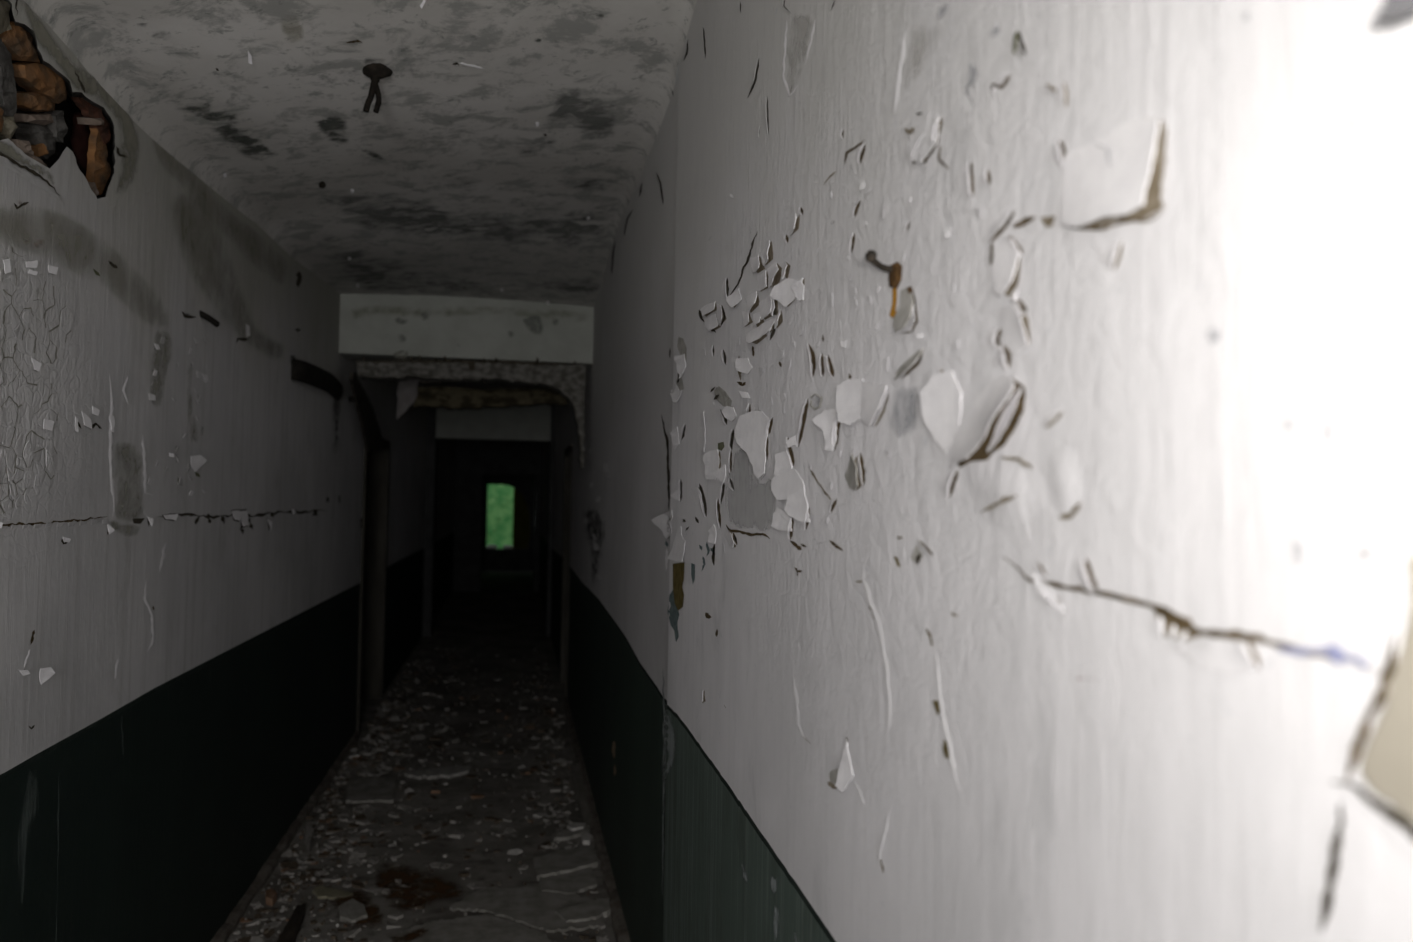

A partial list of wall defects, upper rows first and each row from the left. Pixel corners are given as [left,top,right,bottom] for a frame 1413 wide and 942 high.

spalling [0,0,138,204]
leakage [184,106,272,155]
leakage [317,118,347,142]
leakage [343,198,599,245]
corrosion [888,262,902,318]
peeling [919,117,1167,498]
peeling [651,207,924,641]
crack [0,496,366,534]
peeling [828,737,865,808]
peeling [926,628,960,792]
crack [1004,557,1413,932]
peeling [1354,530,1413,823]